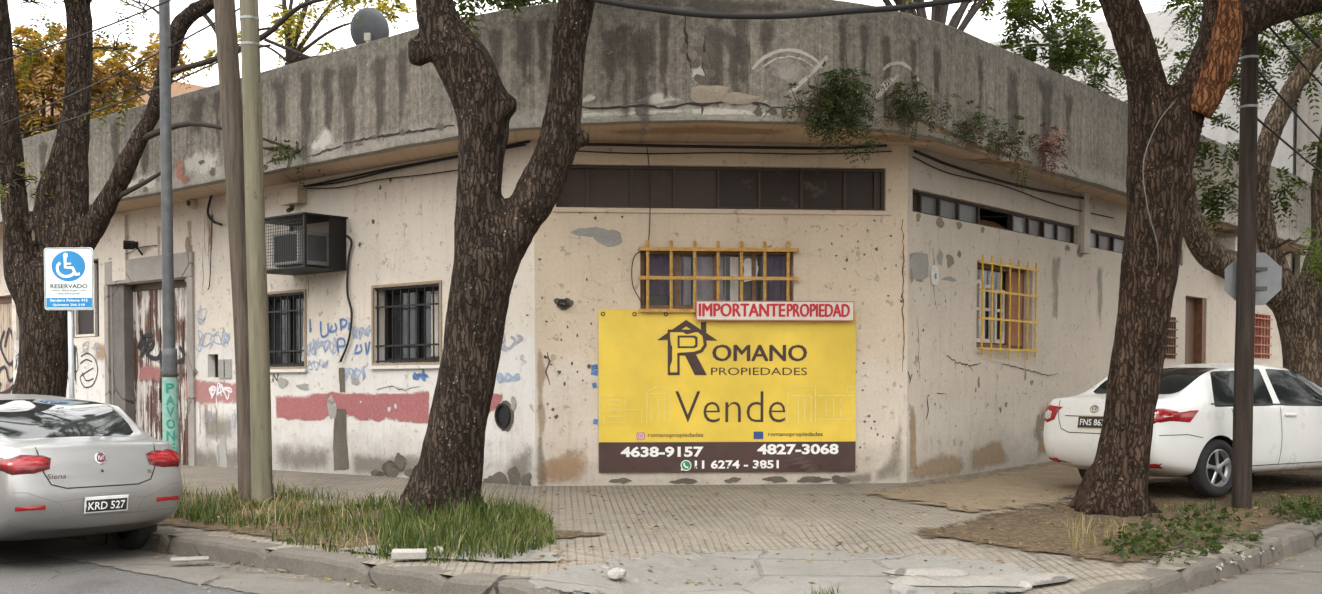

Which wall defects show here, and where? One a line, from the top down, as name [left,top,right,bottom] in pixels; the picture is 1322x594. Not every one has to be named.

leakage [111,122,119,165]
leakage [128,142,155,189]
leakage [185,93,220,174]
leakage [273,80,285,127]
leakage [301,67,356,153]
leakage [373,51,405,137]
leakage [476,19,549,81]
leakage [582,0,941,129]